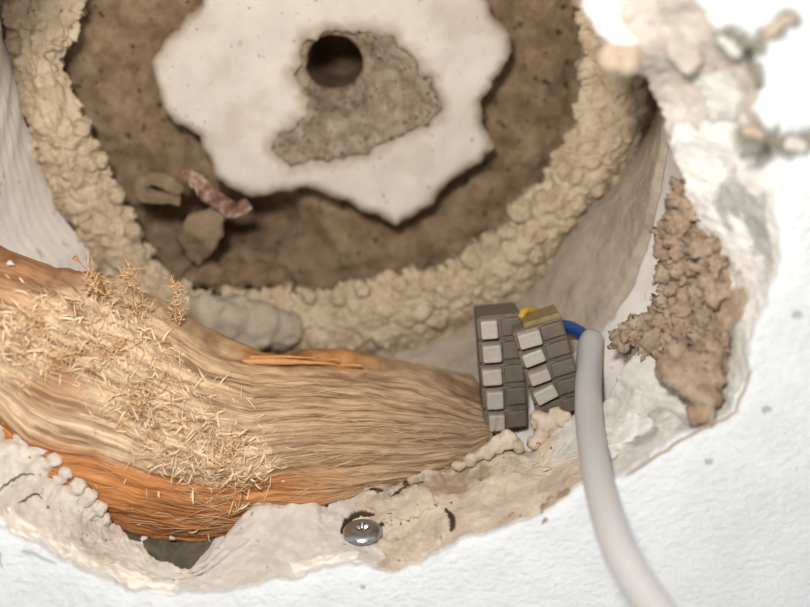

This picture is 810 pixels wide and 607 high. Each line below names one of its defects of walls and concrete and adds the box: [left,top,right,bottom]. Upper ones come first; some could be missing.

spalling [271,30,442,167]
crack [715,11,800,89]
crack [734,124,810,162]
spalling [582,0,780,476]
crack [0,473,43,502]
spalling [0,406,582,595]